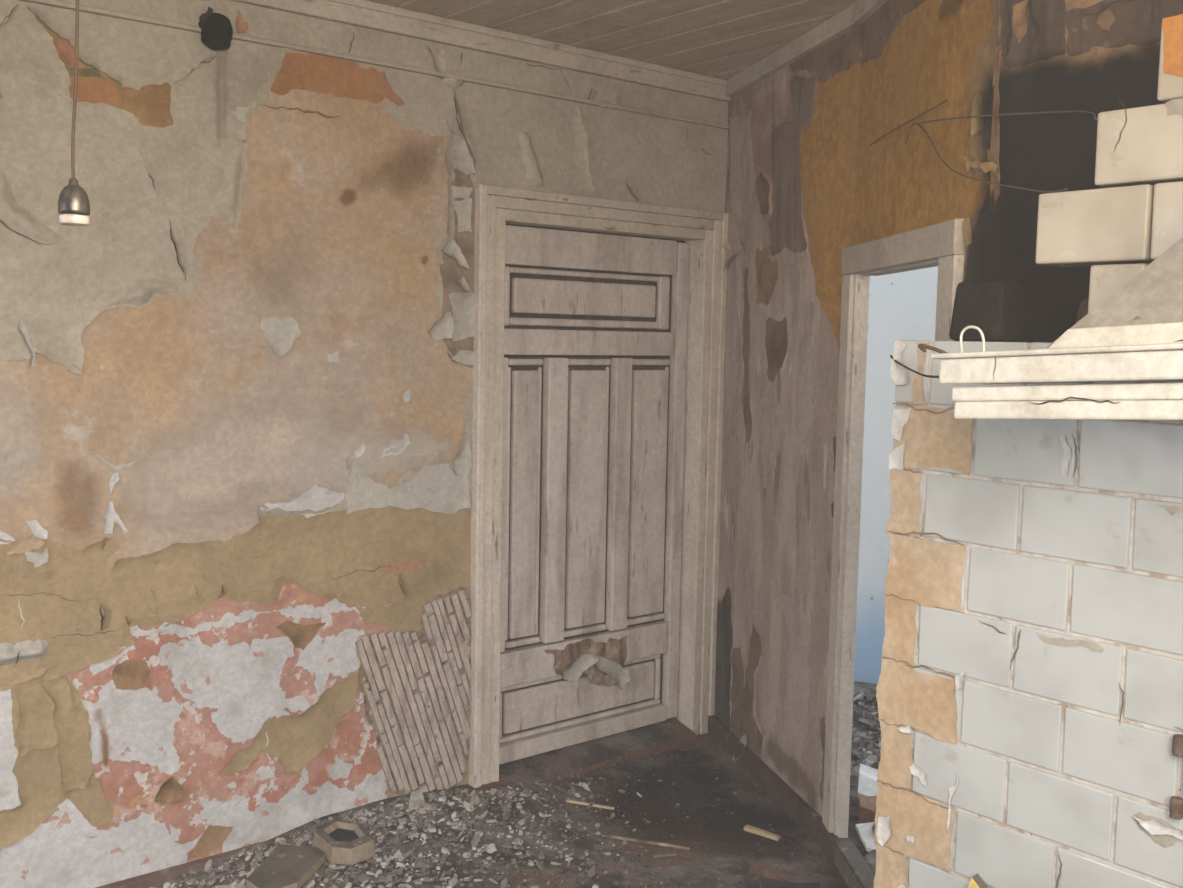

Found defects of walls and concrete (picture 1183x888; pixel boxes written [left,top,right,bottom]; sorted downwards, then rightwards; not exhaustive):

peeling [19,2,183,140]
peeling [963,0,1183,173]
peeling [0,47,476,575]
peeling [721,69,818,442]
peeling [963,217,972,247]
spalling [0,575,472,888]
peeling [479,780,515,788]
peeling [563,654,630,688]
peeling [729,617,766,762]
peeling [874,340,973,888]
crack [980,621,1021,669]
crack [1117,684,1125,722]